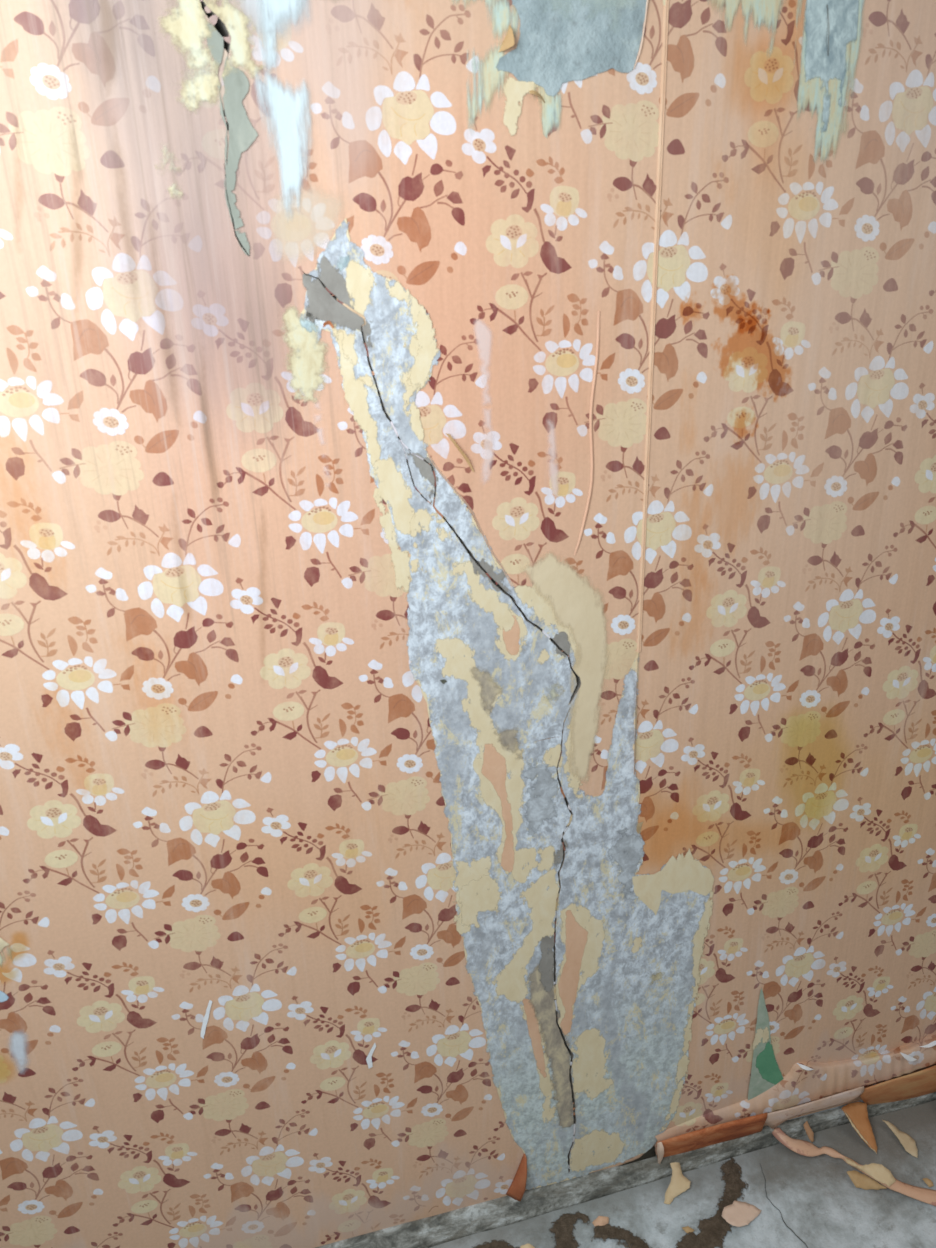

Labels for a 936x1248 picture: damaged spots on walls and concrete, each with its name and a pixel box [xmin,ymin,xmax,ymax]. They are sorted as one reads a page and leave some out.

peeling [160,0,308,256]
peeling [453,0,648,138]
peeling [712,0,781,53]
peeling [796,0,864,160]
crack [298,267,581,1172]
peeling [299,218,714,1190]
spalling [10,1032,26,1070]
peeling [748,988,783,1100]